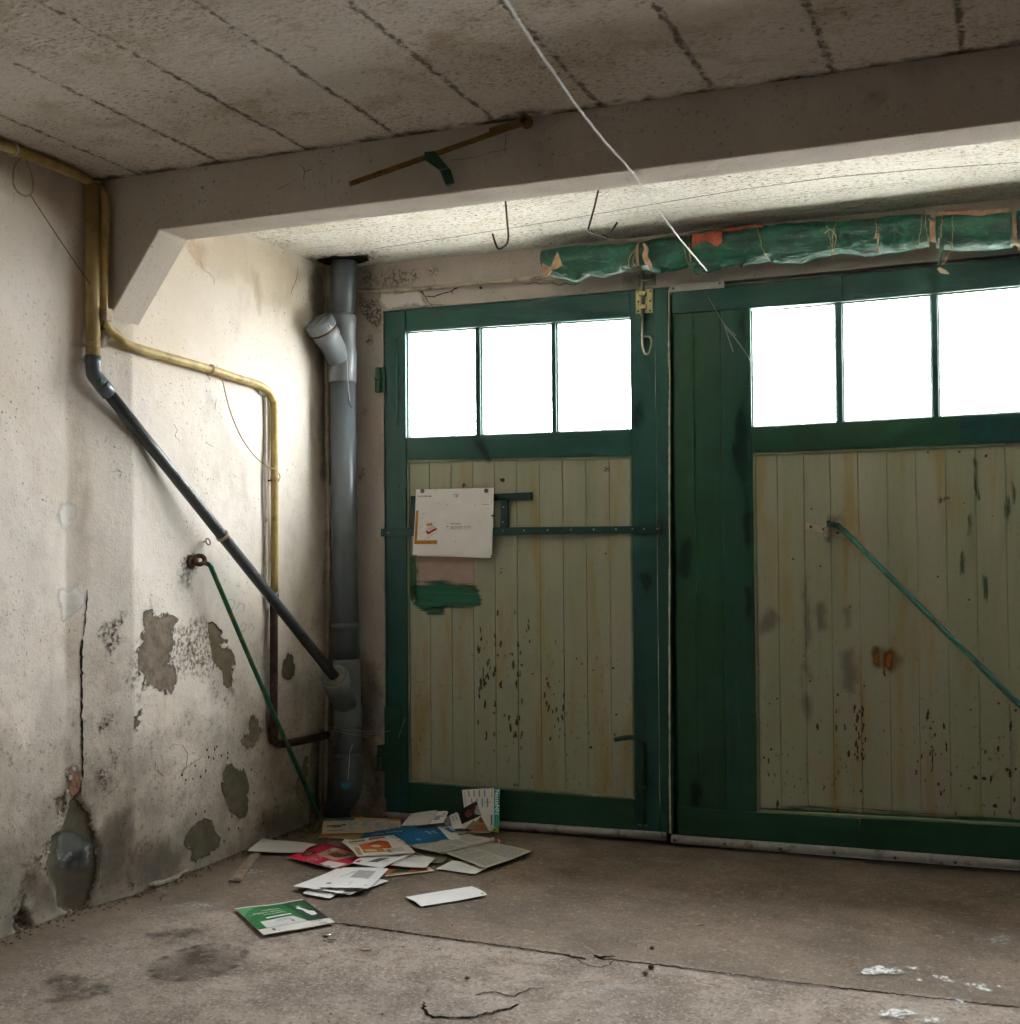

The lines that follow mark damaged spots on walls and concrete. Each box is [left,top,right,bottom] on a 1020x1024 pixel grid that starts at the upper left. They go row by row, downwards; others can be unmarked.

crack [80,590,88,792]
flaking render [126,609,236,732]
spalling [241,715,262,749]
flaking render [34,765,99,913]
crack [421,988,540,1018]
crack [335,922,1016,1007]